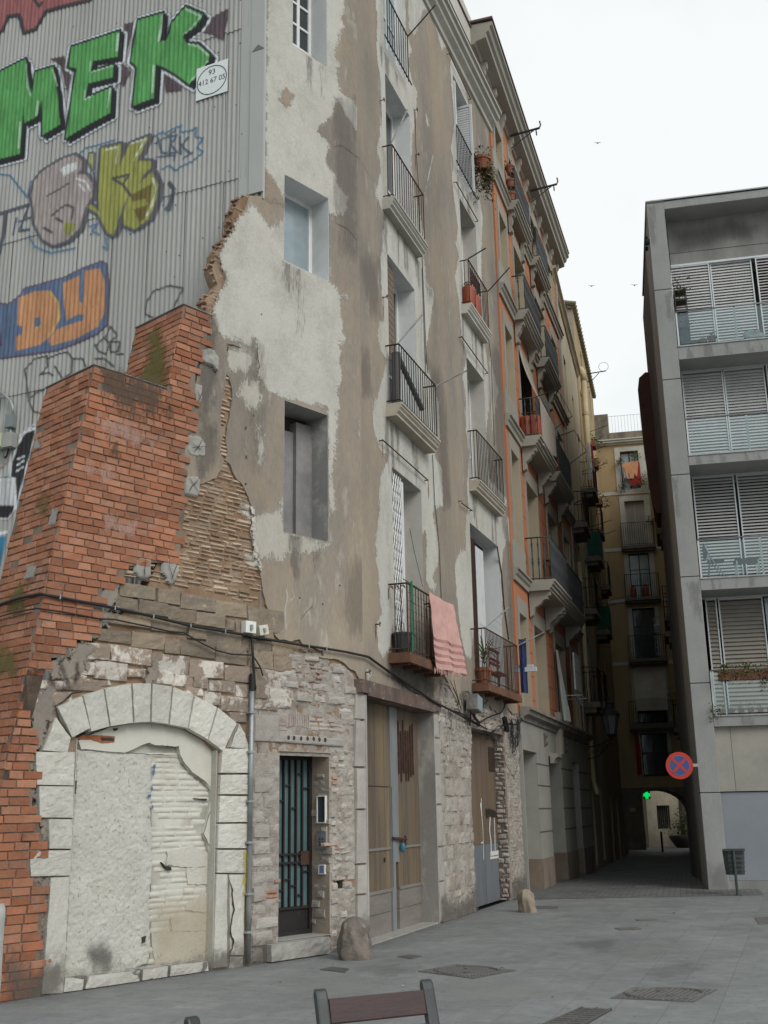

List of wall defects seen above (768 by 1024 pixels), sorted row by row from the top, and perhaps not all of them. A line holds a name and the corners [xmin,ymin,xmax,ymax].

spalling [196,194,248,316]
spalling [124,461,262,602]
crack [228,879,236,953]